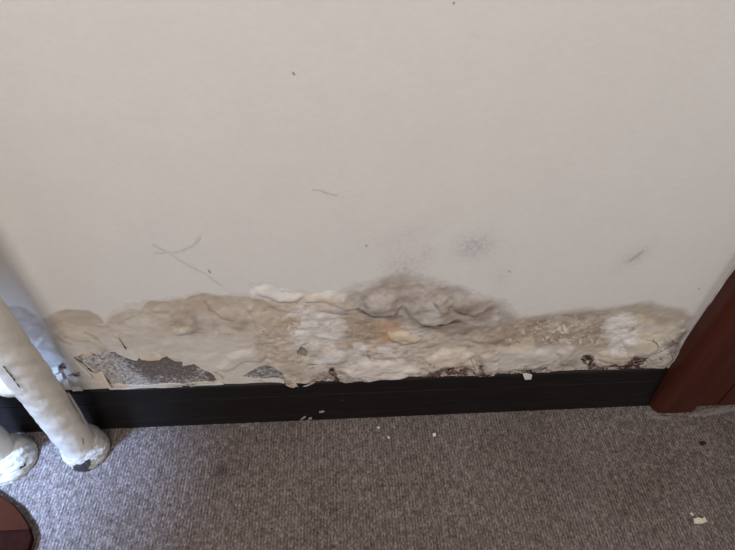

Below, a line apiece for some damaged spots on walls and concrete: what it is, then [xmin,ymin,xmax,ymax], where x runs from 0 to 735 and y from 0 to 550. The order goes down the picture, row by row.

water stain [7,268,697,389]
peeling [52,351,224,392]
peeling [242,365,368,388]
flaking render [422,364,552,380]
flaking render [580,354,665,371]